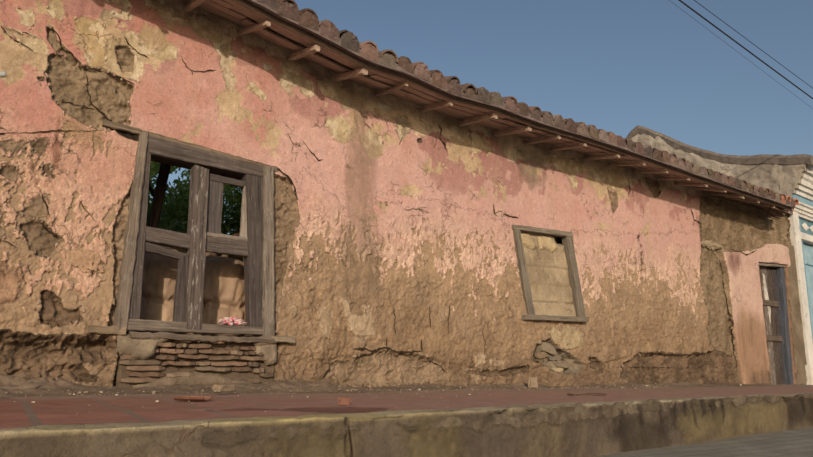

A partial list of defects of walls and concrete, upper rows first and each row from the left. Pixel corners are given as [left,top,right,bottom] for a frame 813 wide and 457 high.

peeling [2,6,50,56]
peeling [46,0,177,82]
peeling [143,0,237,90]
crack [0,127,101,135]
peeling [324,115,384,159]
peeling [395,114,422,142]
peeling [0,133,135,328]
crack [628,352,705,369]
crack [346,425,354,457]